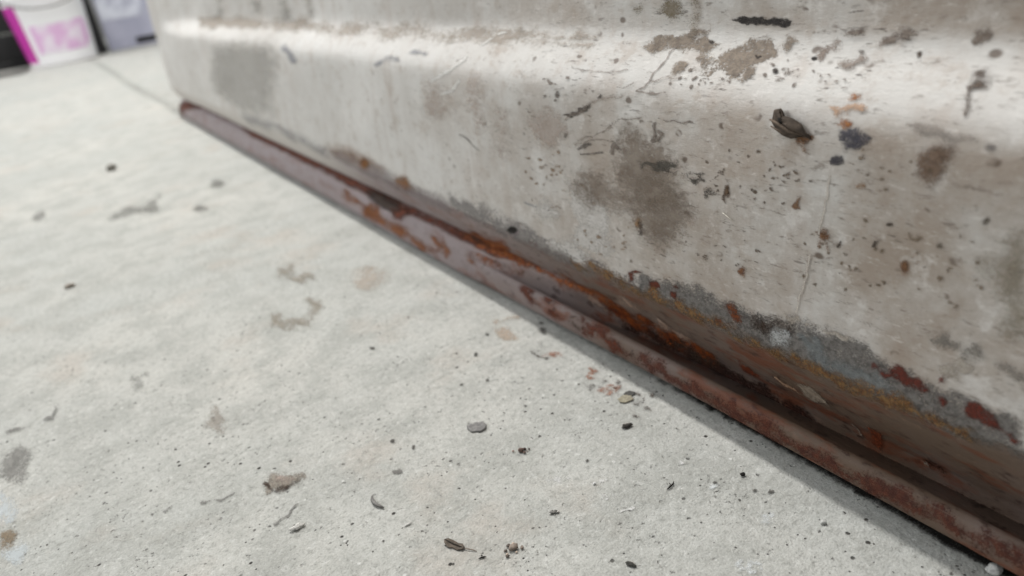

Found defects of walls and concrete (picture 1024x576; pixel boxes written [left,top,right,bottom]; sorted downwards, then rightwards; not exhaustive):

corrosion [179,102,1024,569]
corrosion [830,94,867,130]